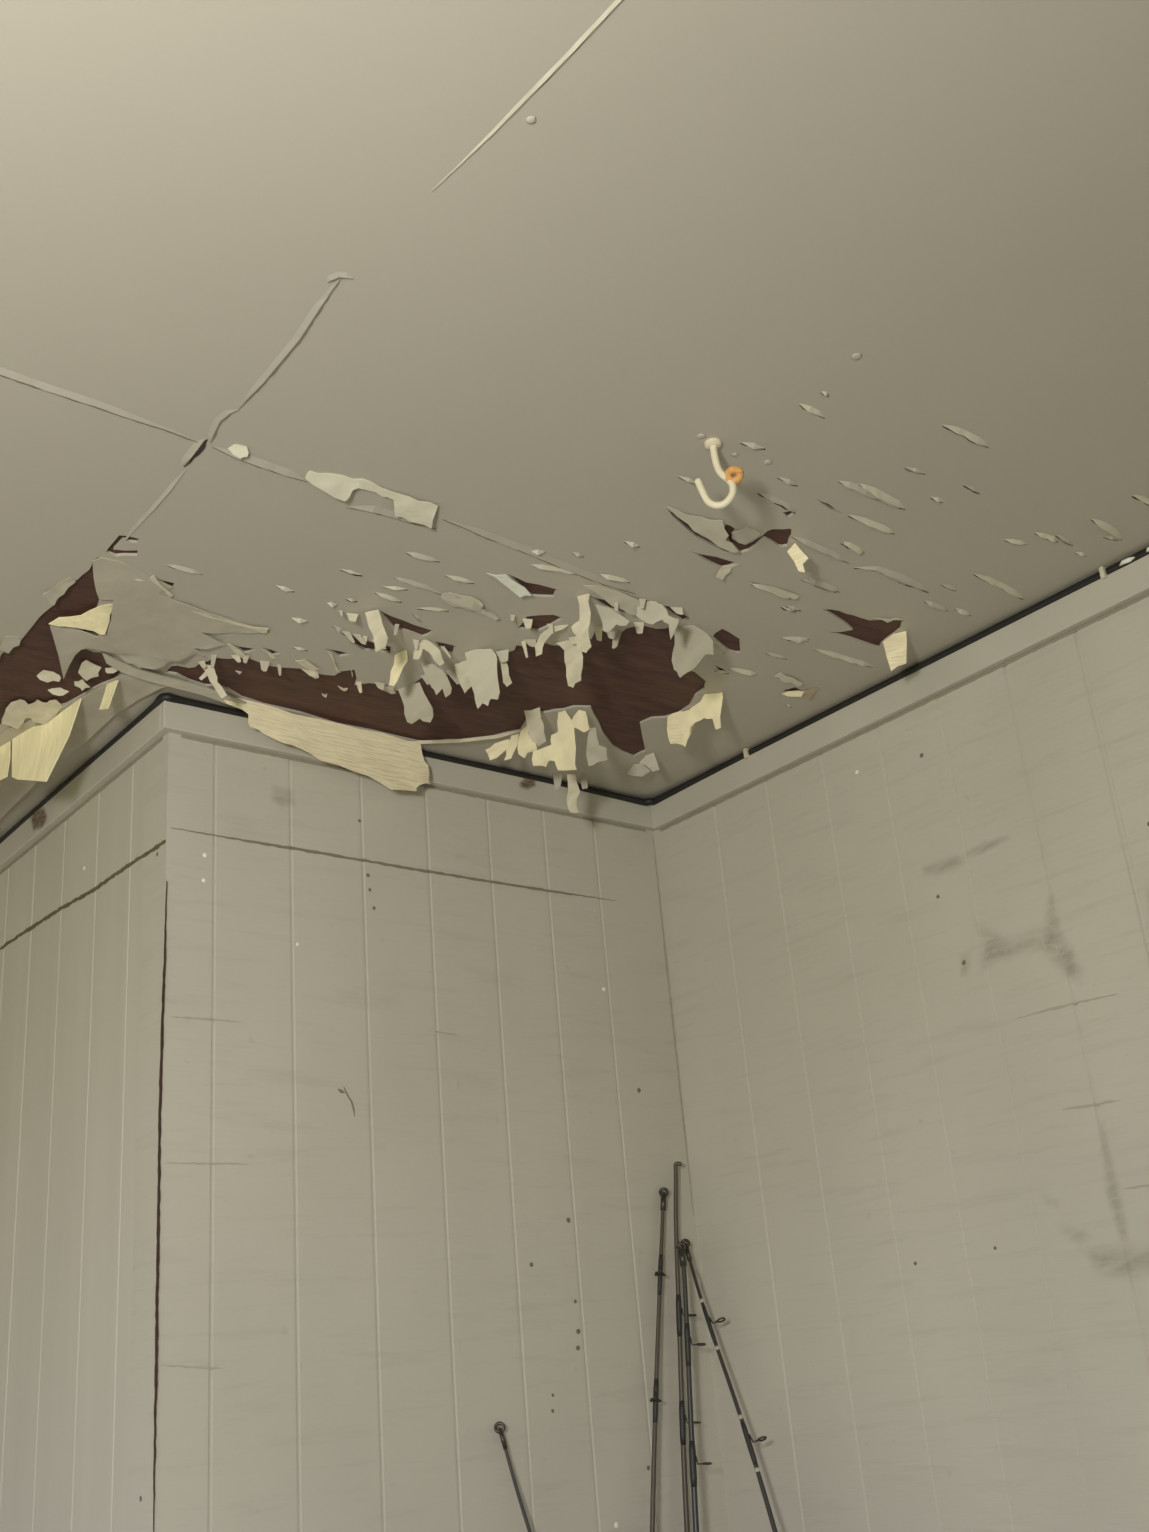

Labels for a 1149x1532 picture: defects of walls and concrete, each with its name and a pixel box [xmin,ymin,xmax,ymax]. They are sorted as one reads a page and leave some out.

peeling [228,444,249,459]
peeling [942,424,989,448]
peeling [305,471,438,528]
peeling [666,477,971,708]
peeling [0,535,757,819]